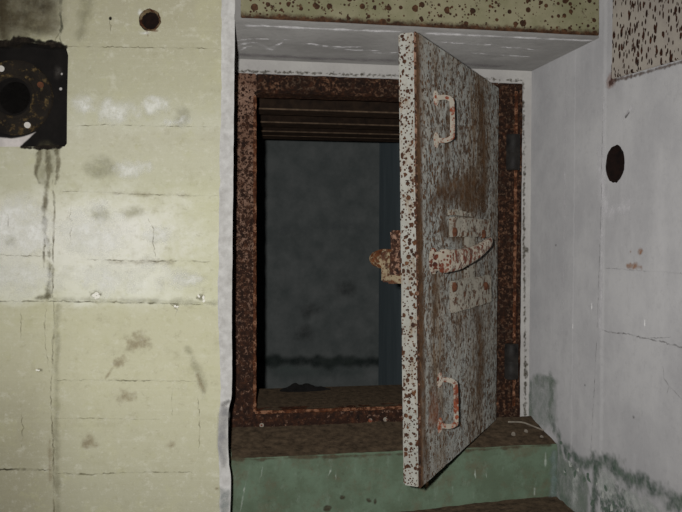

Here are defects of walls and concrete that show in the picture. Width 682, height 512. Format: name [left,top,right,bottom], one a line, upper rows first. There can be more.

rust [417,139,425,368]
rust [434,92,487,240]